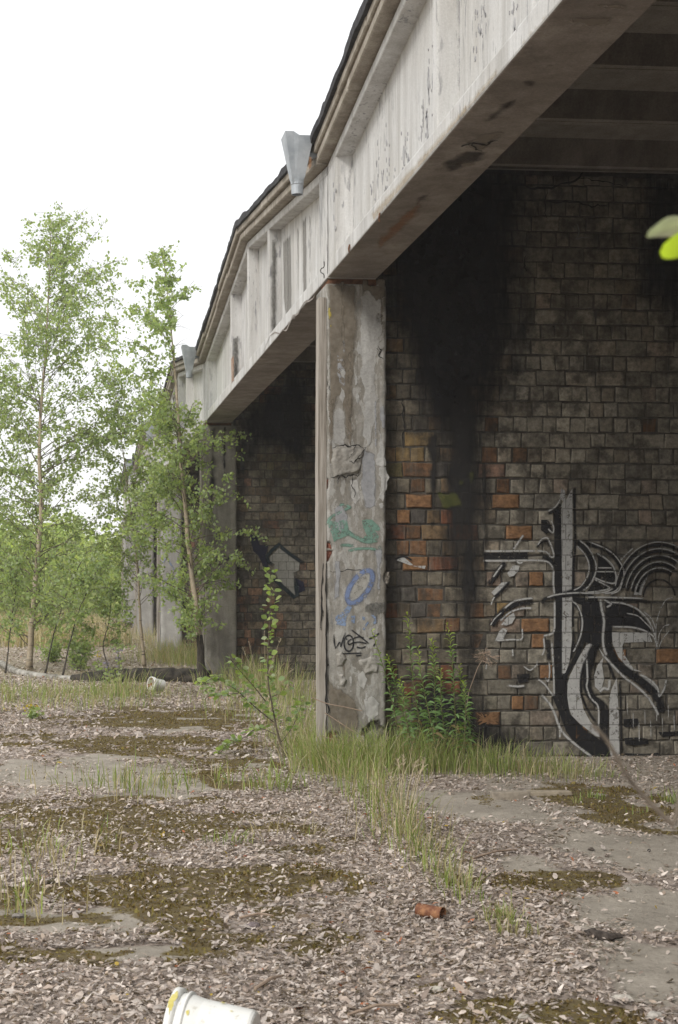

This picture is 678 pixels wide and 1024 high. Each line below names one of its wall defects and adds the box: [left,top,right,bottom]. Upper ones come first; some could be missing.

water stain [445,152,482,171]
crack [461,140,498,151]
peeling [328,293,389,508]
crack [331,444,366,497]
water stain [416,391,518,755]